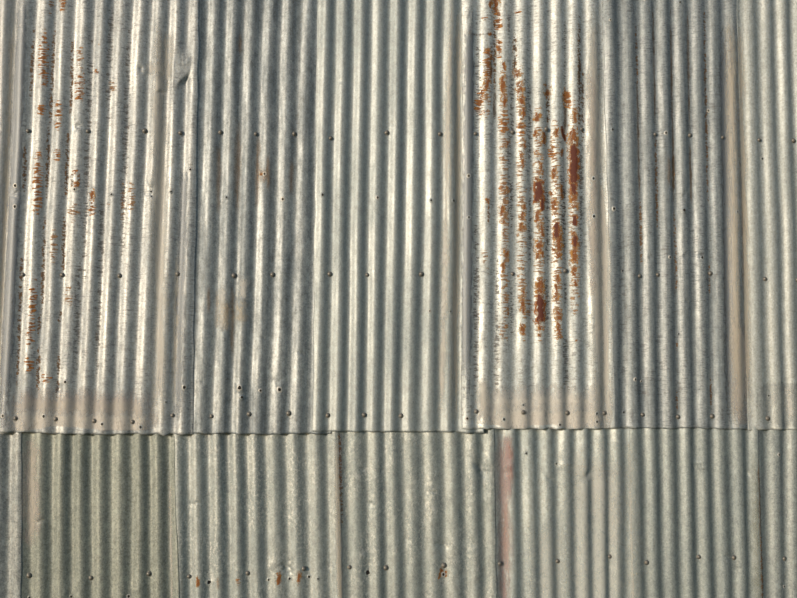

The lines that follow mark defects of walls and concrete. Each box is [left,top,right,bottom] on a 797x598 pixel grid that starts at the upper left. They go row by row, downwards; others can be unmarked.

corrosion [16,23,96,393]
corrosion [474,0,585,342]